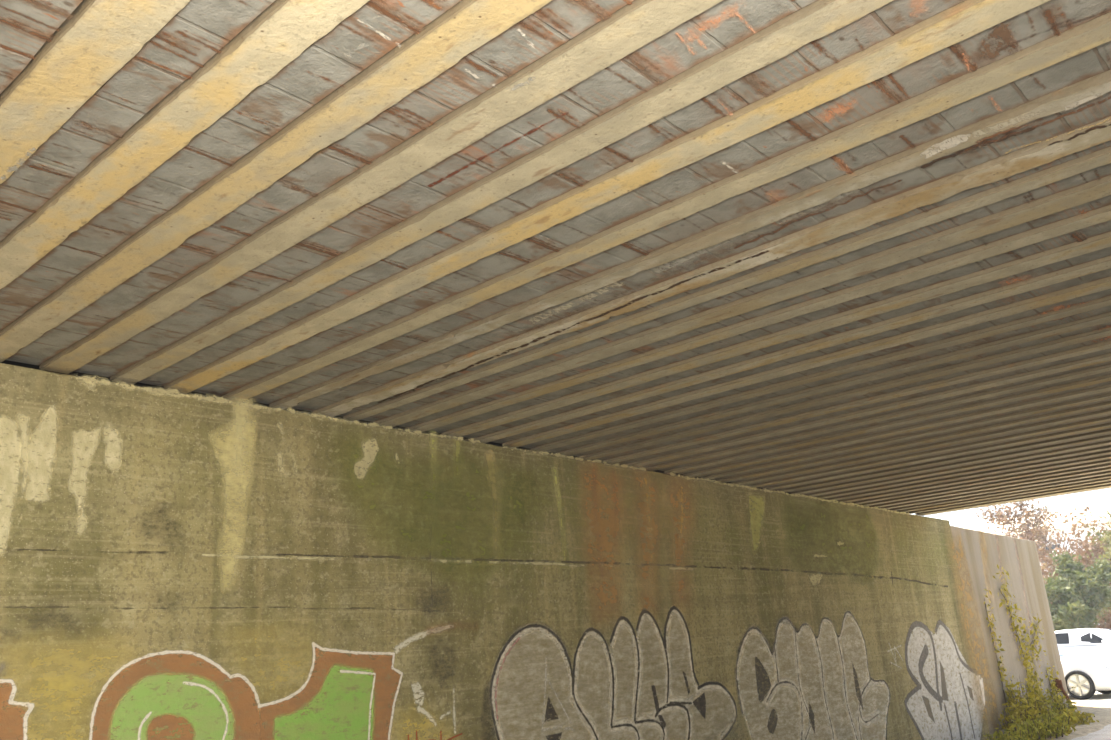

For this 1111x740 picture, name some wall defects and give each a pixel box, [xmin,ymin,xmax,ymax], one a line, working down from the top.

corrosion [1029,10,1107,37]
corrosion [872,73,909,103]
corrosion [786,120,817,141]
crack [921,119,1111,168]
crack [377,250,769,403]
peeling [0,408,57,553]
peeling [69,428,122,532]
peeling [354,420,480,479]
spalling [503,447,646,471]
crack [202,530,948,612]